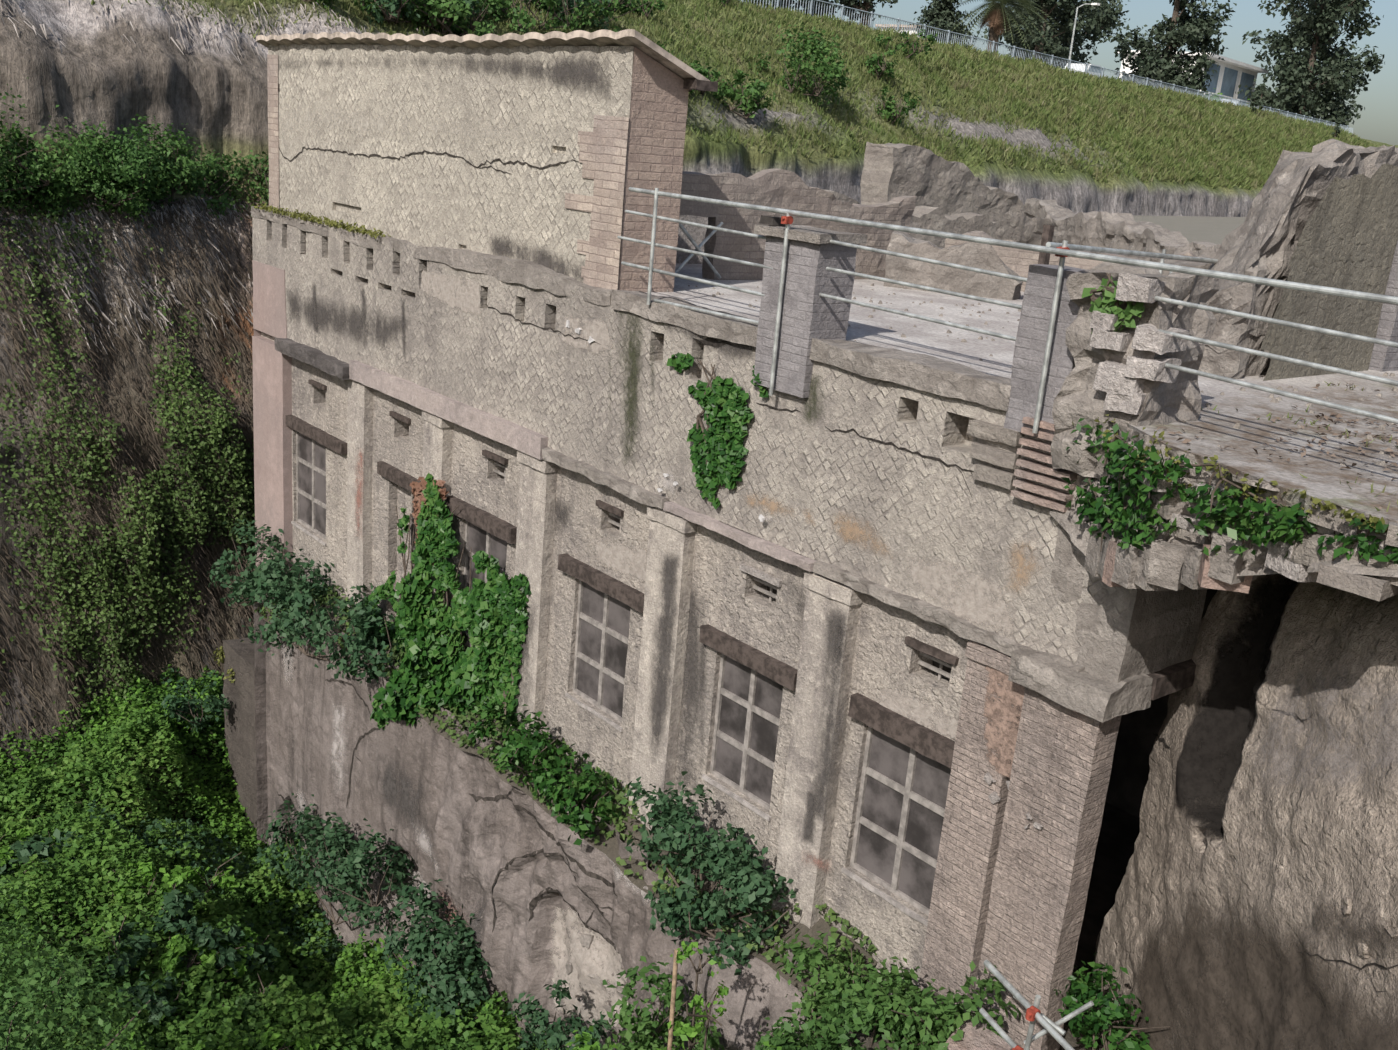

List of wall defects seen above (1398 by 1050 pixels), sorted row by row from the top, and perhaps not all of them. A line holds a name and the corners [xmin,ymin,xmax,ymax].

damp [466,60,605,89]
crack [279,147,579,174]
damp [289,286,405,351]
crack [755,402,974,497]
crack [325,678,385,807]
damp [651,557,701,784]
damp [804,613,845,839]
crack [469,788,619,954]